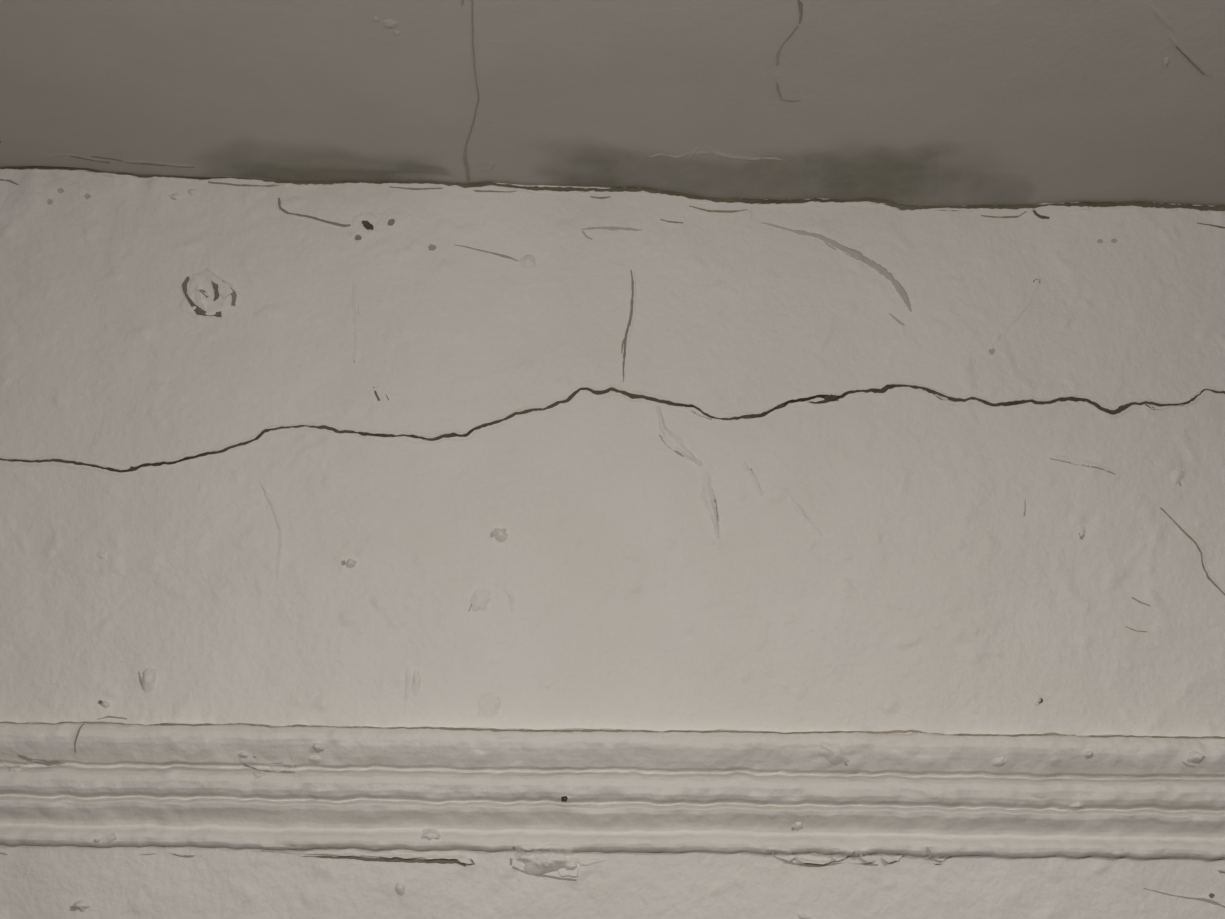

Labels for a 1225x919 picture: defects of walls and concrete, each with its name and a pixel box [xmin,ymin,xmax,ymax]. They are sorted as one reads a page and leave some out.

crack [0,0,1225,229]
crack [0,270,1225,475]
crack [1160,508,1225,595]